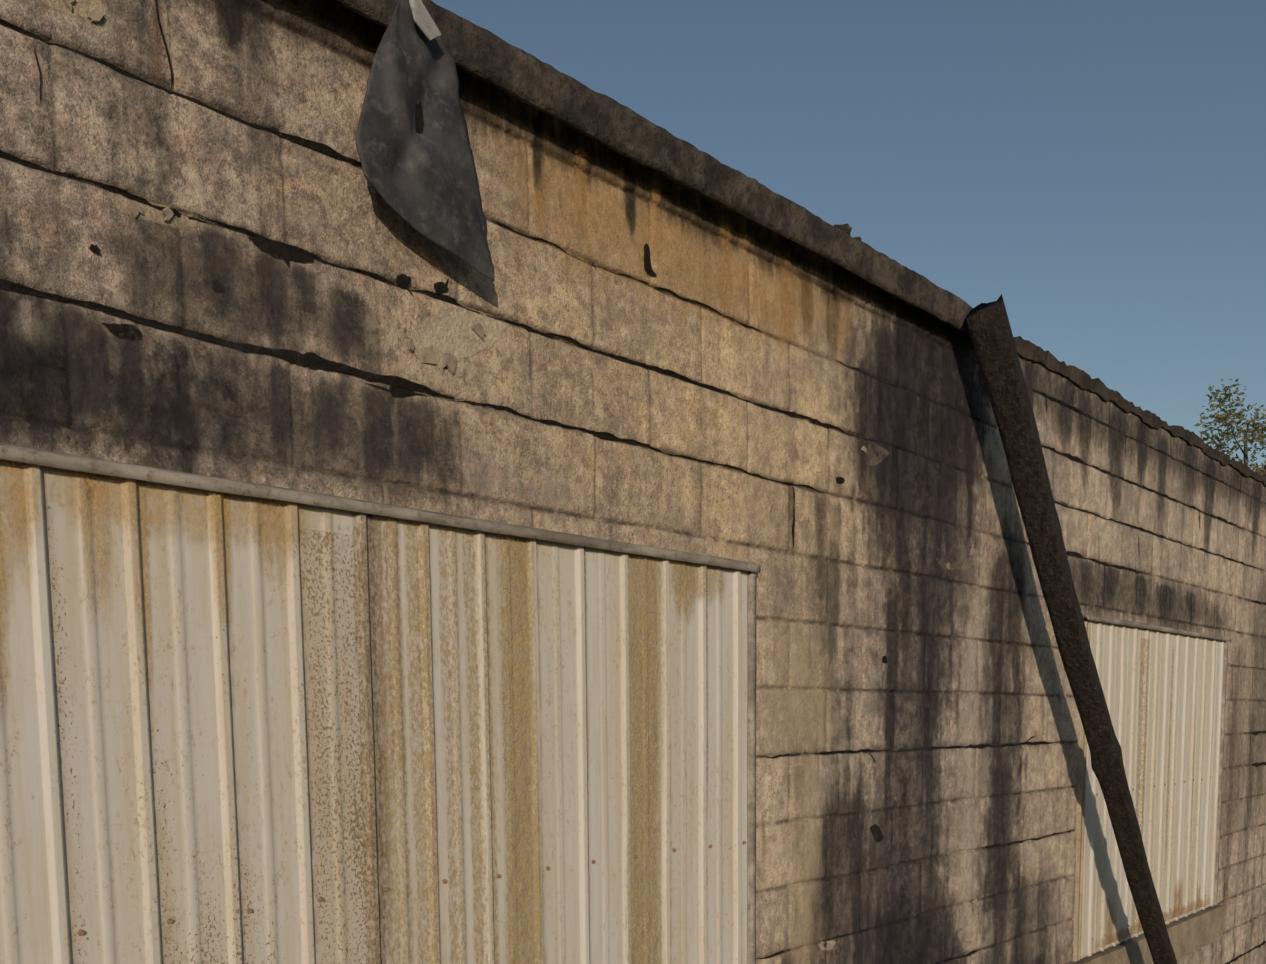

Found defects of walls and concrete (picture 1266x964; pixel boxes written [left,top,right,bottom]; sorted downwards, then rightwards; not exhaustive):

crack [0,0,361,165]
leakage [217,0,381,64]
leakage [172,233,313,337]
corrosion [0,460,77,745]
leakage [0,303,446,478]
leakage [456,65,1023,964]
leakage [1025,360,1266,545]
leakage [1071,560,1221,629]
corrosion [69,471,542,964]
corrosion [628,553,722,964]
corrosion [1137,638,1149,836]